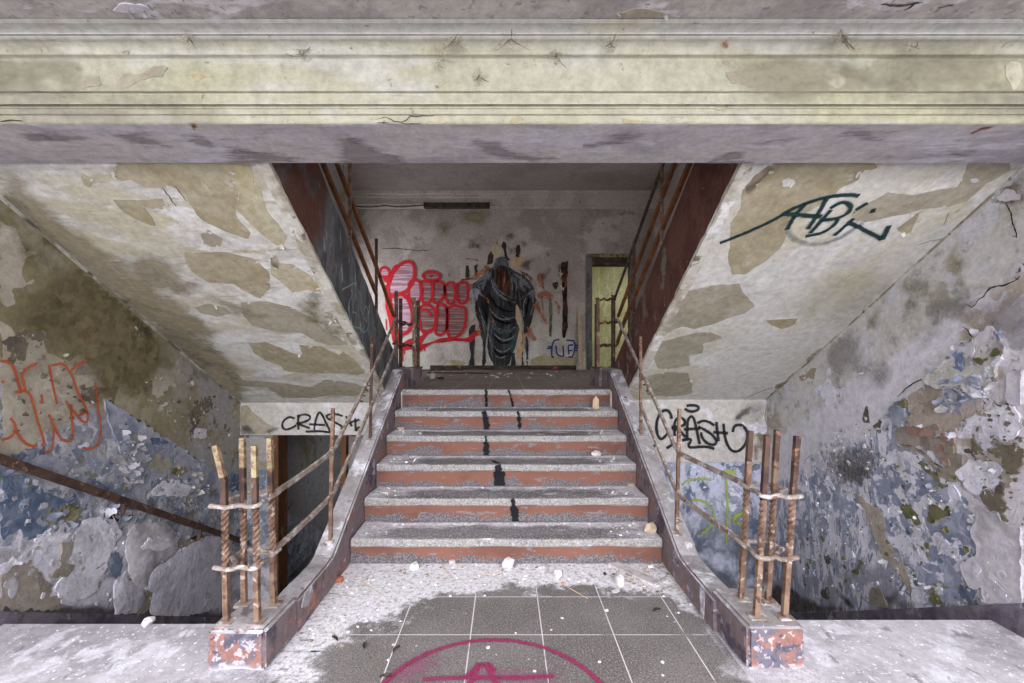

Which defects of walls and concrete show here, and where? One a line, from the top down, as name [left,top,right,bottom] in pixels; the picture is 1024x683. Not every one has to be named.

damp [1,179,242,400]
peeling [110,163,370,398]
crack [376,115,434,124]
peeling [645,163,877,397]
peeling [852,163,1022,237]
crack [963,276,1020,337]
crack [1006,203,1017,238]
peeling [0,321,275,615]
mould [821,444,883,500]
peeling [794,320,1024,608]